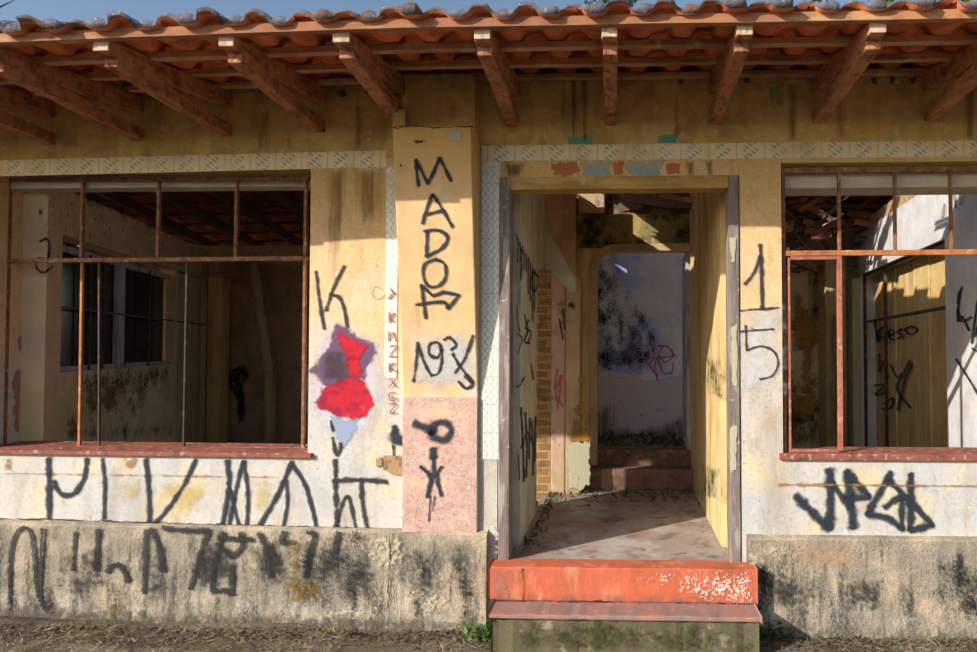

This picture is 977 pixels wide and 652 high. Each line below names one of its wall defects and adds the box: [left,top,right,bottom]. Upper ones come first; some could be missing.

peeling [626,160,663,176]
leakage [34,548,103,613]
leakage [190,547,235,587]
leakage [248,530,370,614]
leakage [402,550,434,617]
leakage [757,561,822,611]
leakage [841,581,883,610]
leakage [933,555,977,624]